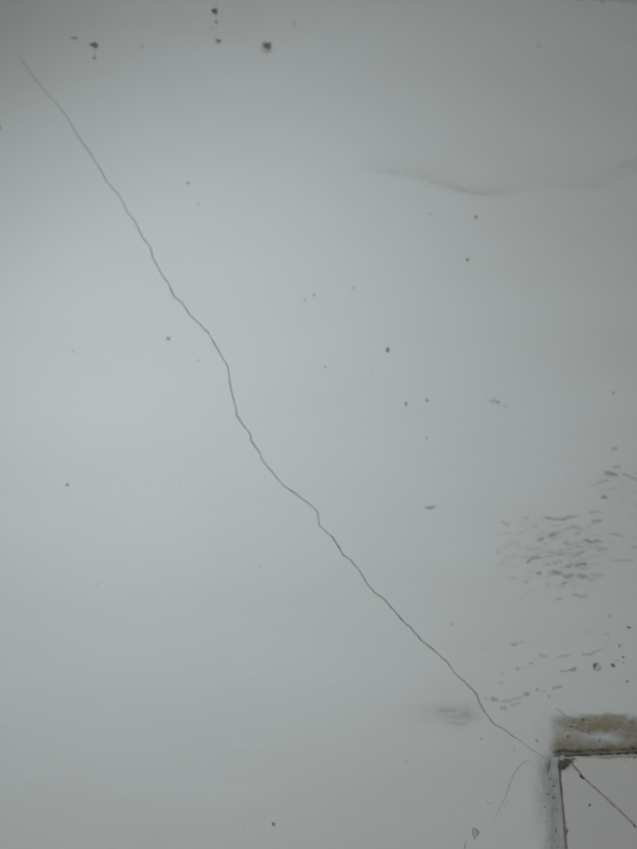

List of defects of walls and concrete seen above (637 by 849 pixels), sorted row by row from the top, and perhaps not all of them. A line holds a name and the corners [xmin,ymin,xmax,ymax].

damp [555,717,637,757]